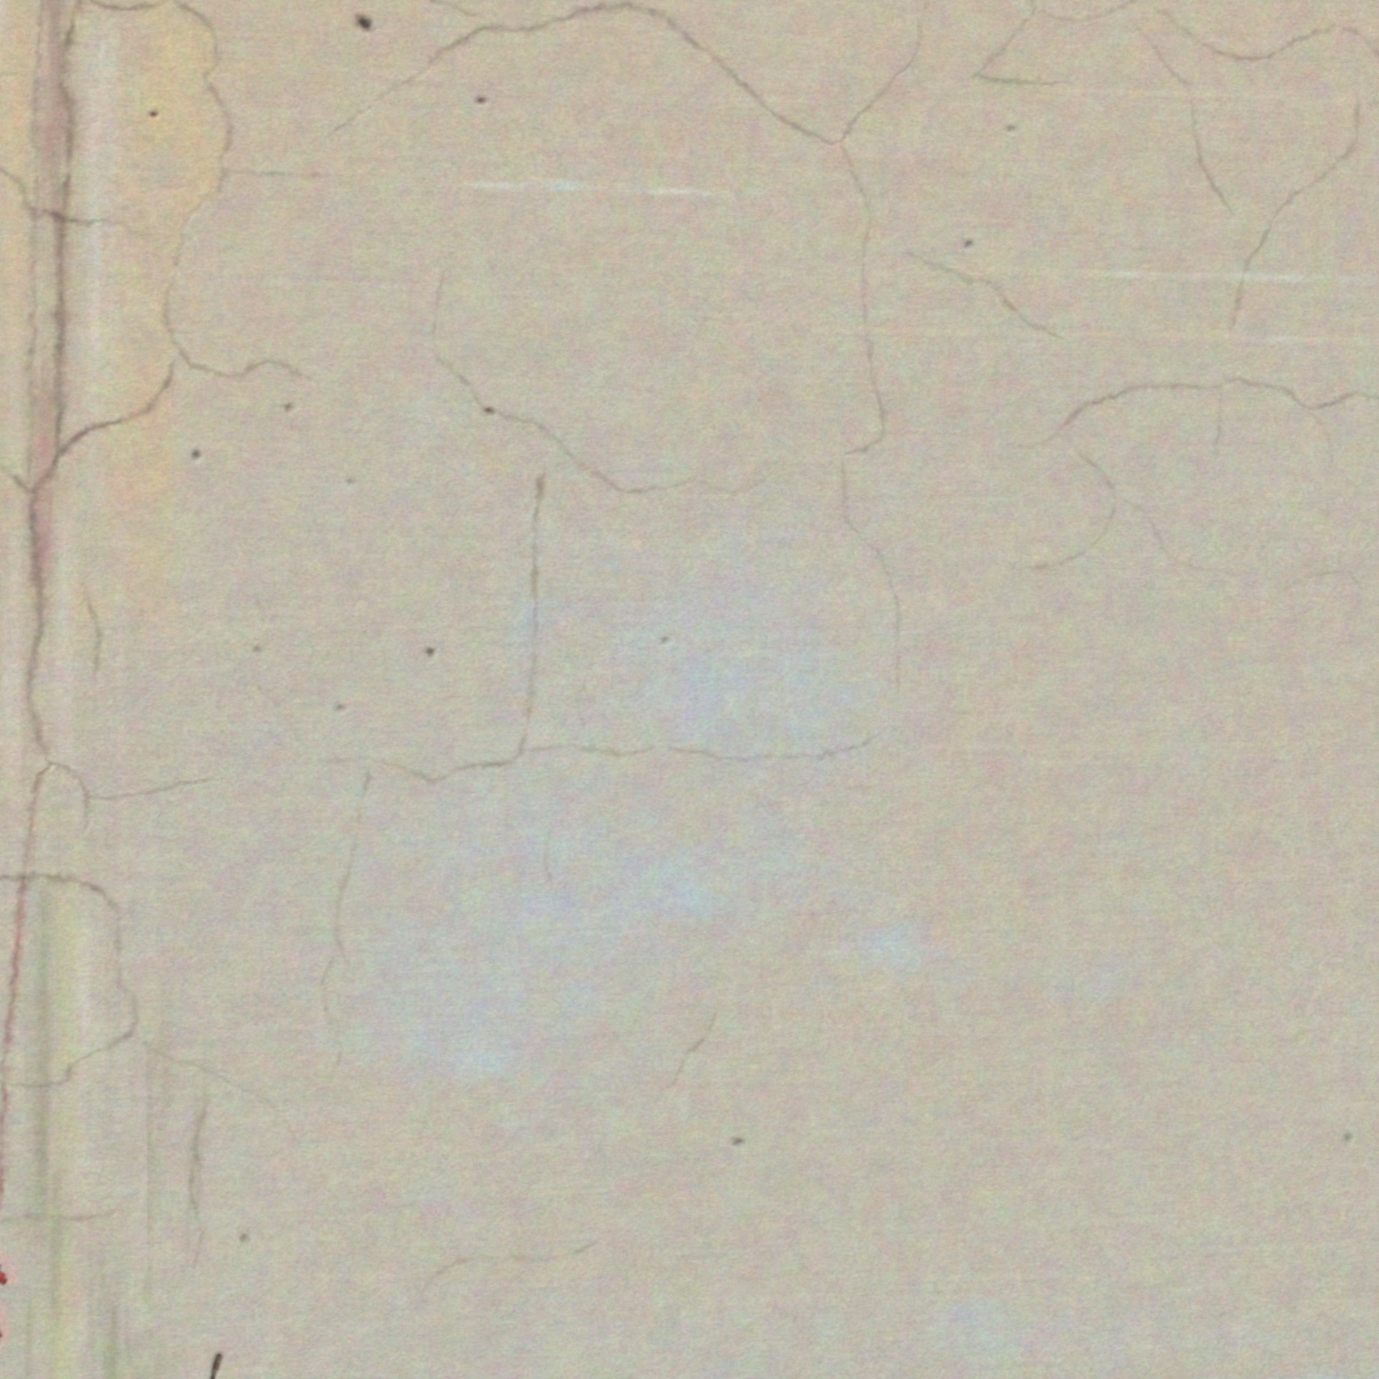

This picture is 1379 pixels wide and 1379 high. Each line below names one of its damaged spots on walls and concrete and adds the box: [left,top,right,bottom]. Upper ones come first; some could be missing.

crack [969,0,1379,335]
crack [0,0,1067,1272]
crack [1006,374,1379,577]